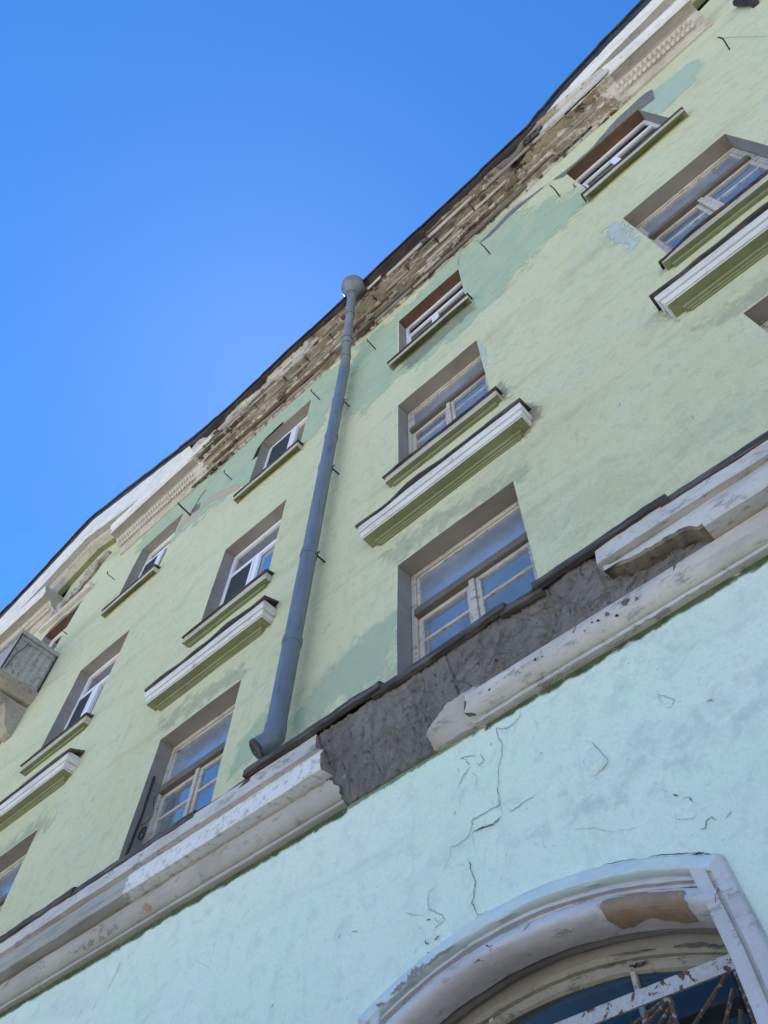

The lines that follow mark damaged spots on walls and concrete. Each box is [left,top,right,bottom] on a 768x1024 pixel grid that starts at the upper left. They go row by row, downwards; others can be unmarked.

crack [450,691,562,919]
crack [408,890,444,953]
flaking render [600,890,698,929]